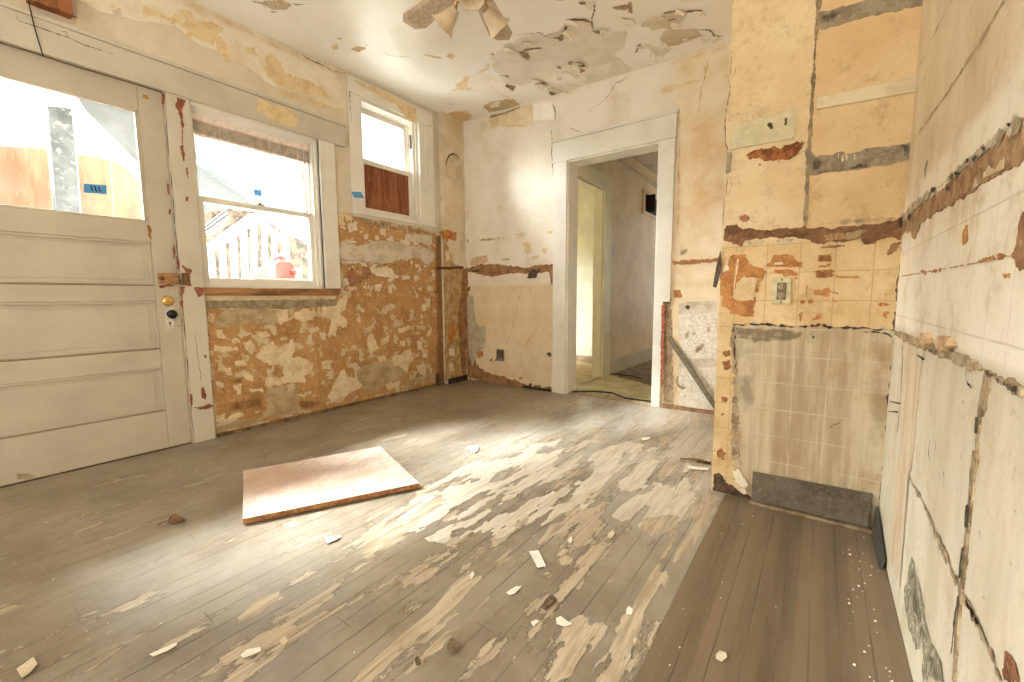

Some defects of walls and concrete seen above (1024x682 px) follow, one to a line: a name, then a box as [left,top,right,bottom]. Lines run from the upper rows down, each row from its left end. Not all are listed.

spalling [159,212,435,337]
flaking render [204,329,362,401]
flaking render [189,387,259,422]